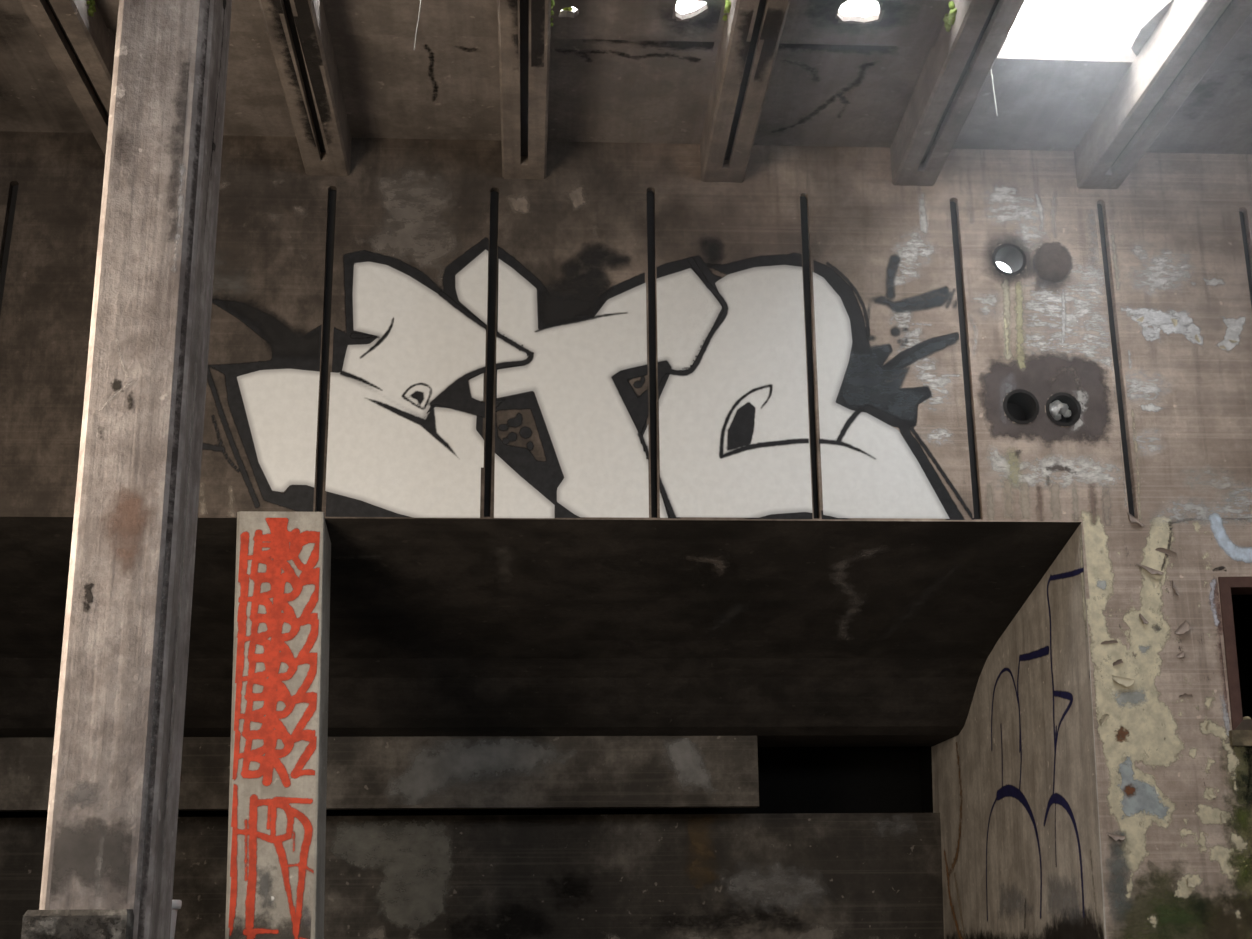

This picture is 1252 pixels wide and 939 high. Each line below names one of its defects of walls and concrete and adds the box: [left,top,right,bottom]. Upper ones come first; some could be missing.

crack [425,45,476,100]
peeling [1121,308,1246,351]
peeling [1079,511,1250,898]